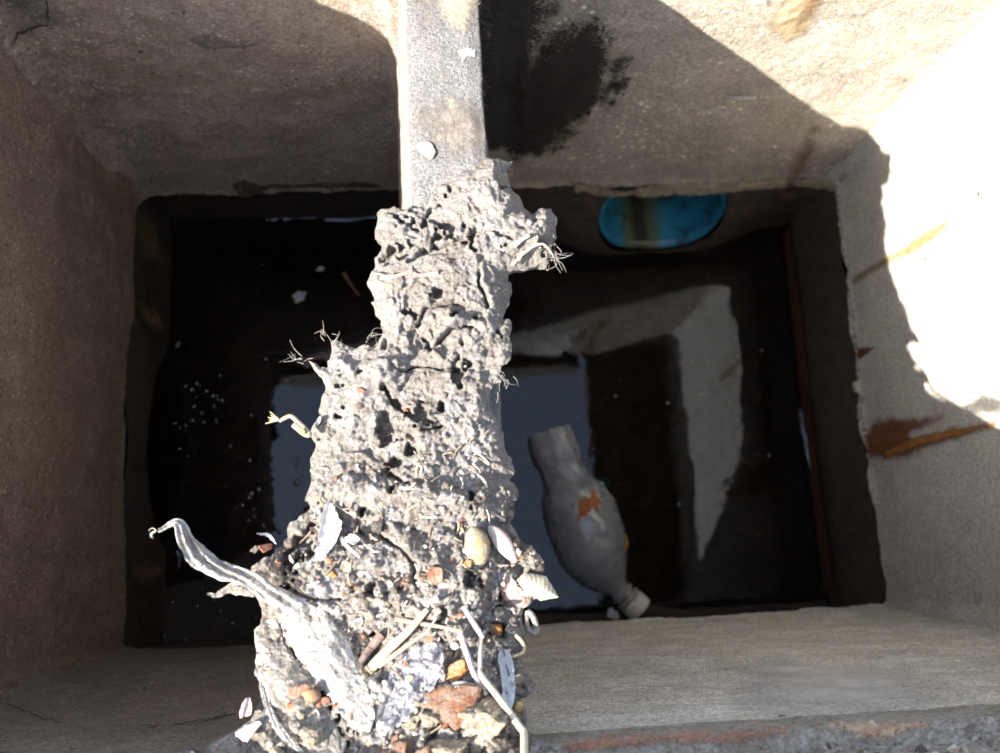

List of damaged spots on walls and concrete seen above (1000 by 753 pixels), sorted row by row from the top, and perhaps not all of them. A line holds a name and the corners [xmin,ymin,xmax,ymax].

corrosion [769,0,819,42]
corrosion [853,223,945,282]
corrosion [865,418,993,458]